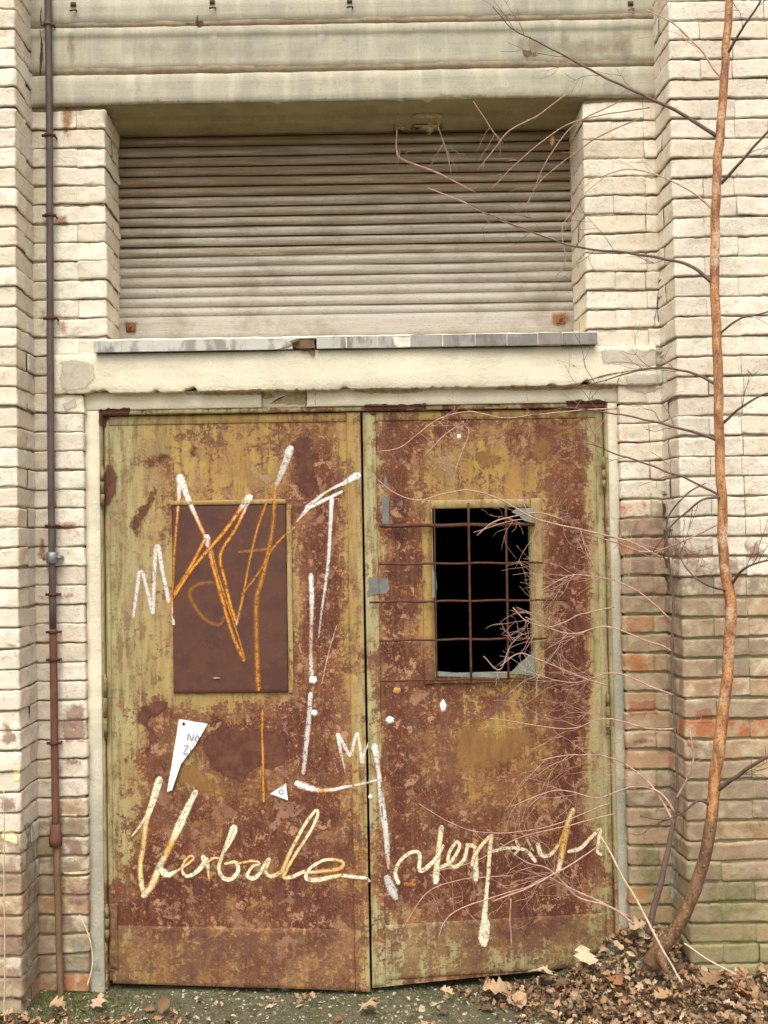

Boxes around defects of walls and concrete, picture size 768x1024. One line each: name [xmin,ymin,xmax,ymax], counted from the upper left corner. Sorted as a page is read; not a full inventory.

rust [63,108,72,132]
rust [98,408,130,427]
rust [364,403,426,415]